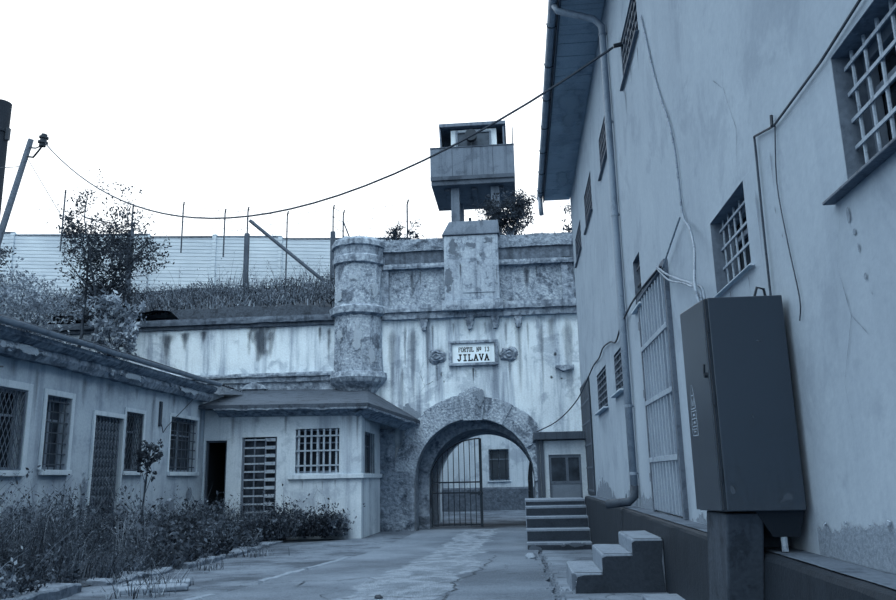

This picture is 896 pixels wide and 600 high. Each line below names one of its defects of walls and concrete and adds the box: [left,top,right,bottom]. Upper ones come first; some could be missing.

leakage [249,327,273,355]
peeling [817,520,896,574]